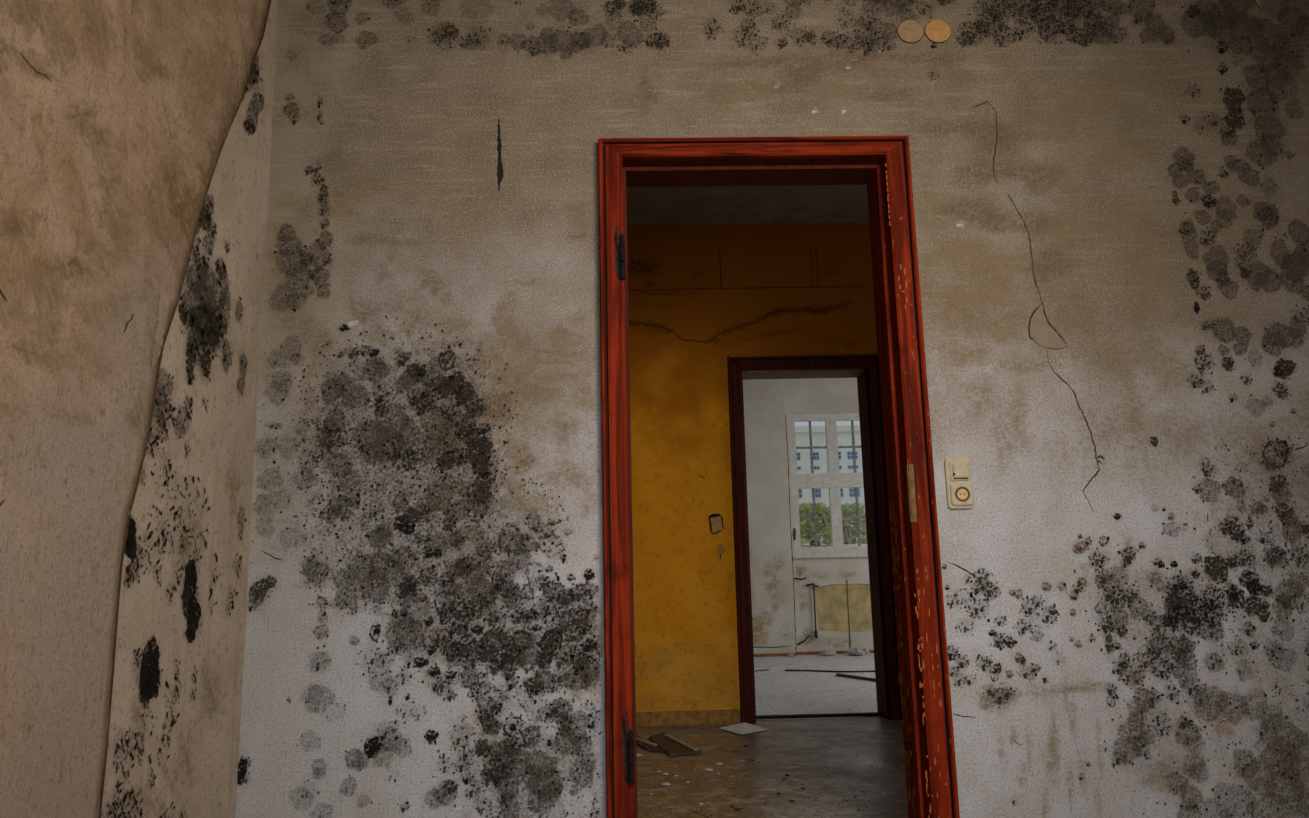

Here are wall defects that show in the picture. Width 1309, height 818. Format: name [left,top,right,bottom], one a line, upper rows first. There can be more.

damp [408,0,670,59]
damp [702,0,955,56]
damp [266,166,345,313]
crack [972,101,1042,303]
damp [952,0,1309,405]
damp [124,167,277,643]
crack [1046,349,1105,512]
damp [257,310,602,818]
damp [945,436,1309,818]
damp [102,637,211,818]
damp [237,756,251,785]